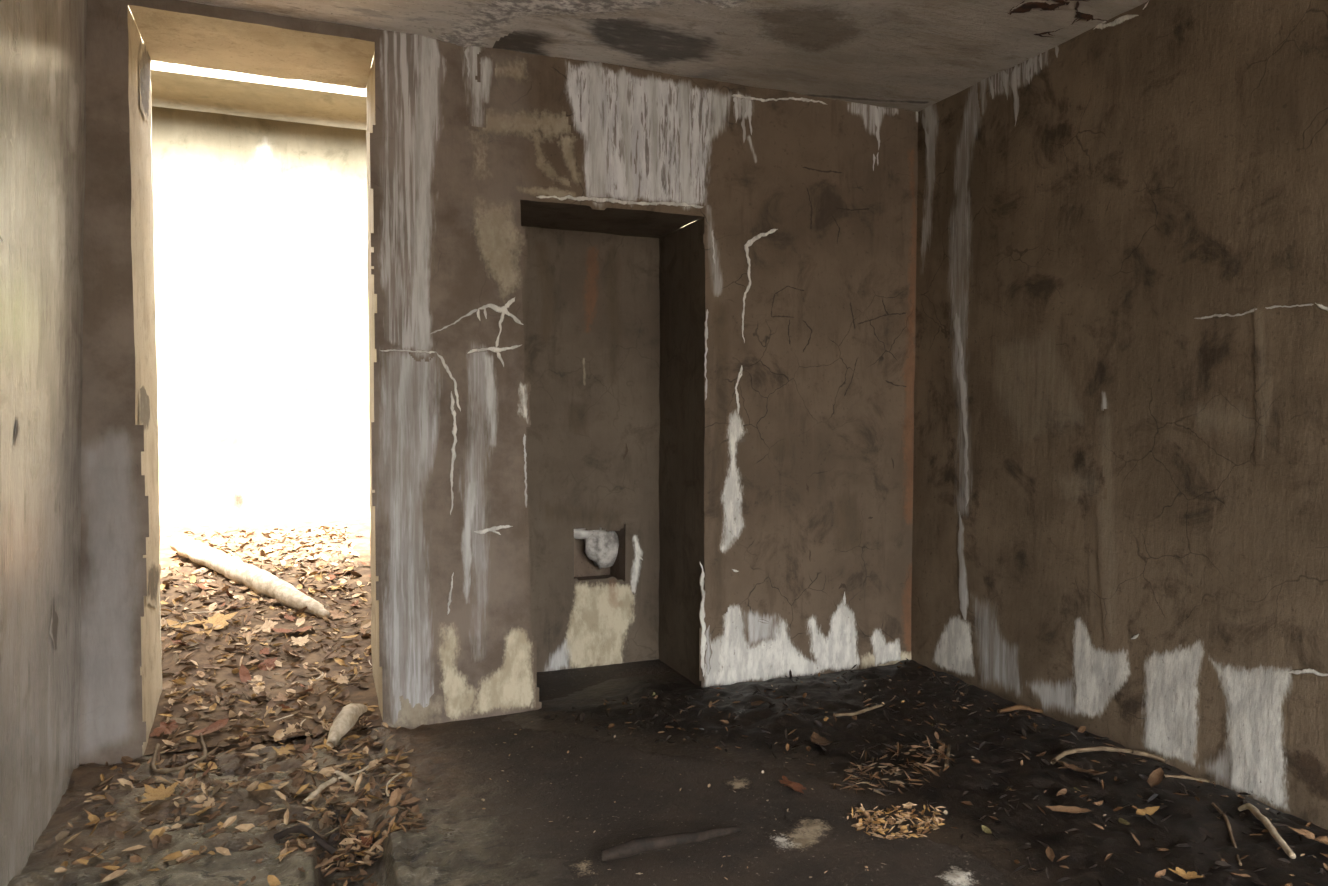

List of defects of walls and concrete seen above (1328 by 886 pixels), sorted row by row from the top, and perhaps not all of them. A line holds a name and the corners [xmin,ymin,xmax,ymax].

water stain [79,422,149,764]
water stain [210,136,330,511]
water stain [370,0,1328,815]